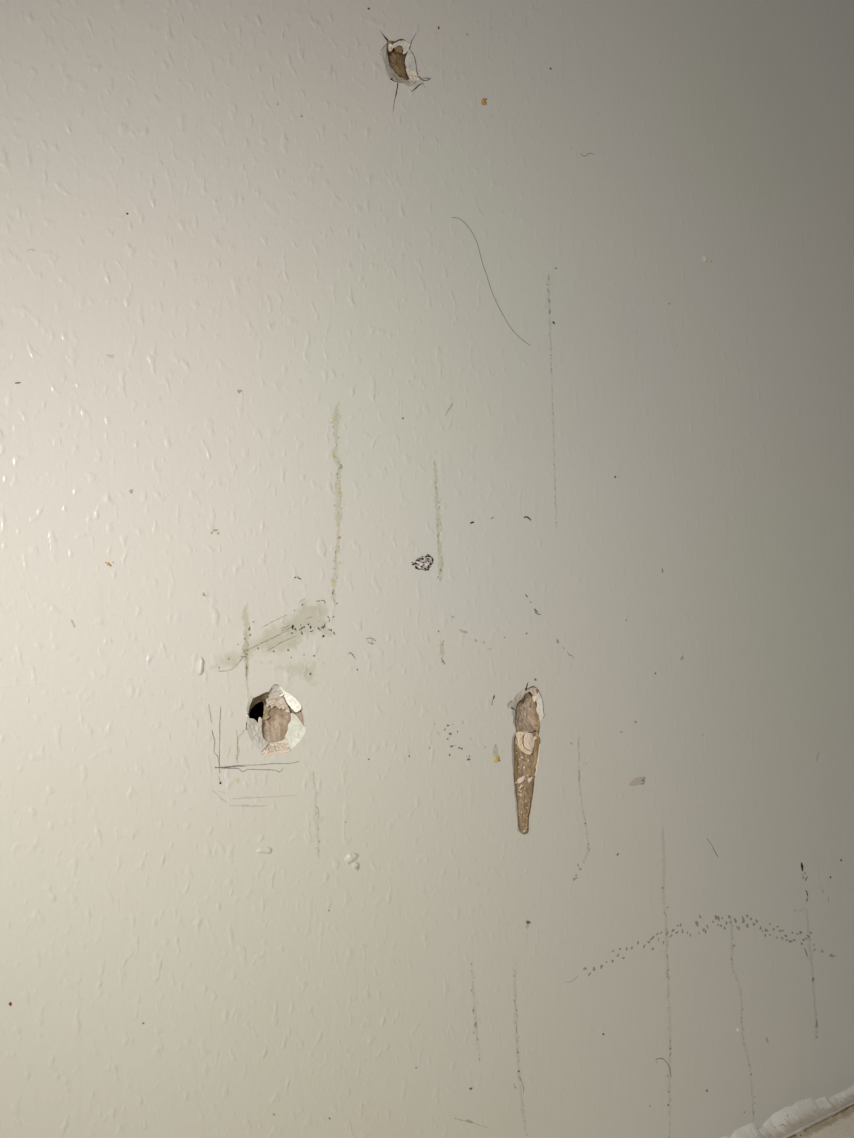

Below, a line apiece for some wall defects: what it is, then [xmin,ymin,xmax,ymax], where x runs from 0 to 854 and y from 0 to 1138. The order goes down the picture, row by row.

peeling [279,686,302,712]
peeling [512,731,540,835]